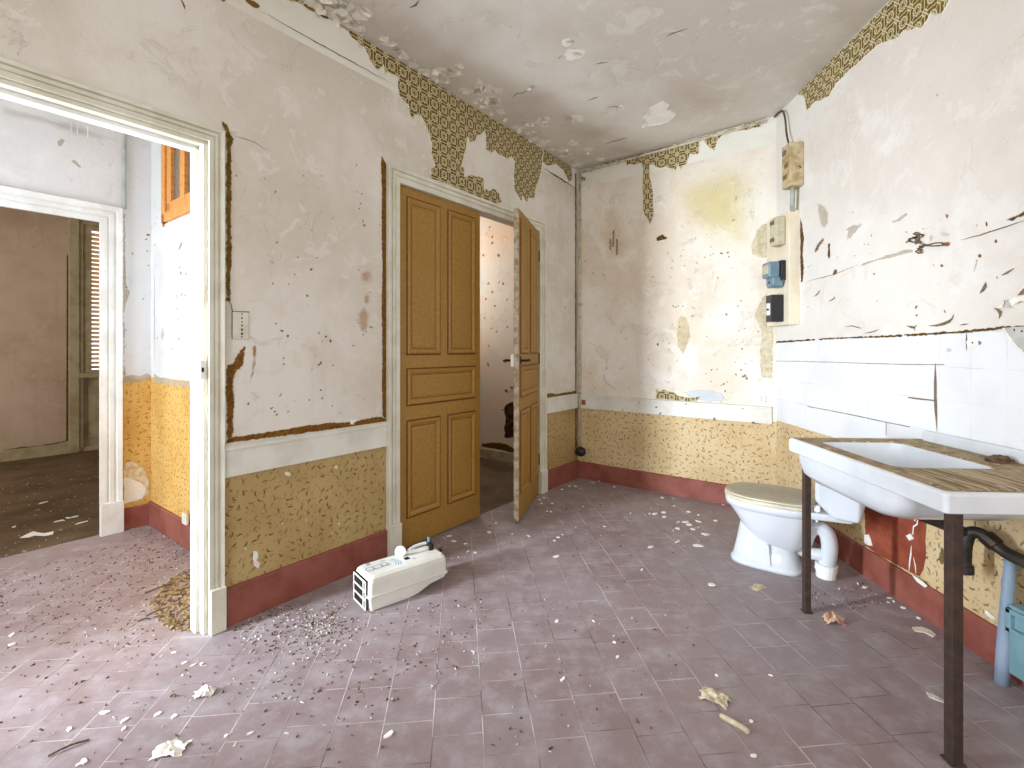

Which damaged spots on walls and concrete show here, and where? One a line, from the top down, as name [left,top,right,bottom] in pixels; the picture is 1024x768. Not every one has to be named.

peeling [379,36,605,167]
spalling [800,219,811,282]
crack [962,221,1022,240]
flaking render [656,305,694,352]
crack [792,361,944,429]
spalling [123,461,150,504]